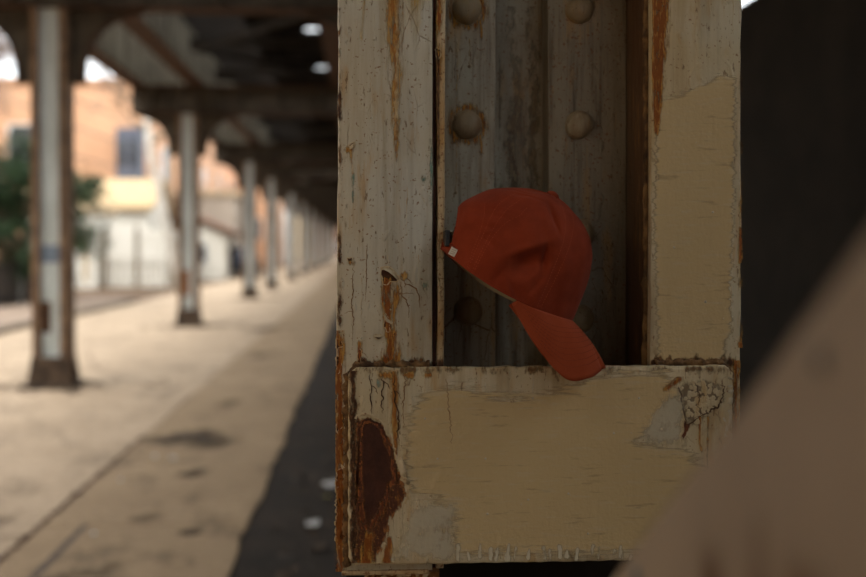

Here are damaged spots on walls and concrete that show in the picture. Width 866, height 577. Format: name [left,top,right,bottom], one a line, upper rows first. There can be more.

rust [386,0,403,159]
rust [652,0,669,135]
crack [348,250,407,444]
rust [335,272,458,572]
crack [665,377,725,425]
rust [651,354,740,419]